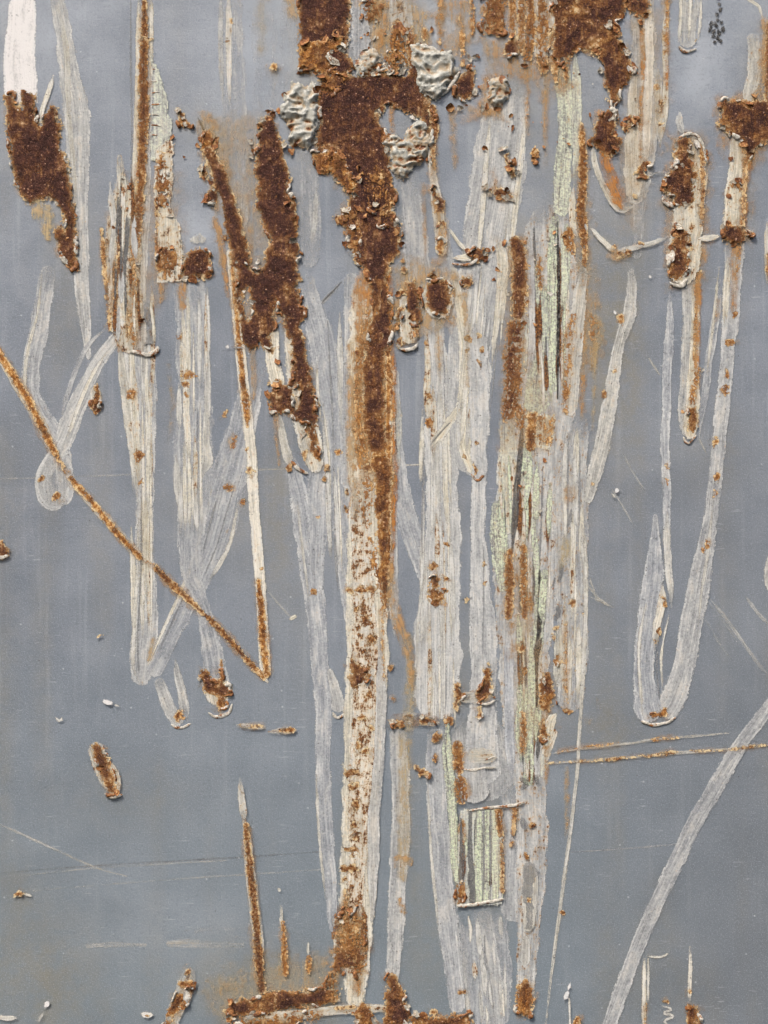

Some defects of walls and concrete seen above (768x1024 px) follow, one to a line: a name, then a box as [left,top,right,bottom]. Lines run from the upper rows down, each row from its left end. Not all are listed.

peeling [449,230,495,266]
peeling [129,302,160,357]
corrosion [0,0,768,684]
corrosion [519,624,768,779]
corrosion [89,742,122,799]
peeling [449,796,525,908]
corrosion [222,768,475,1024]
spalling [522,863,539,930]
corrosion [513,978,536,1020]